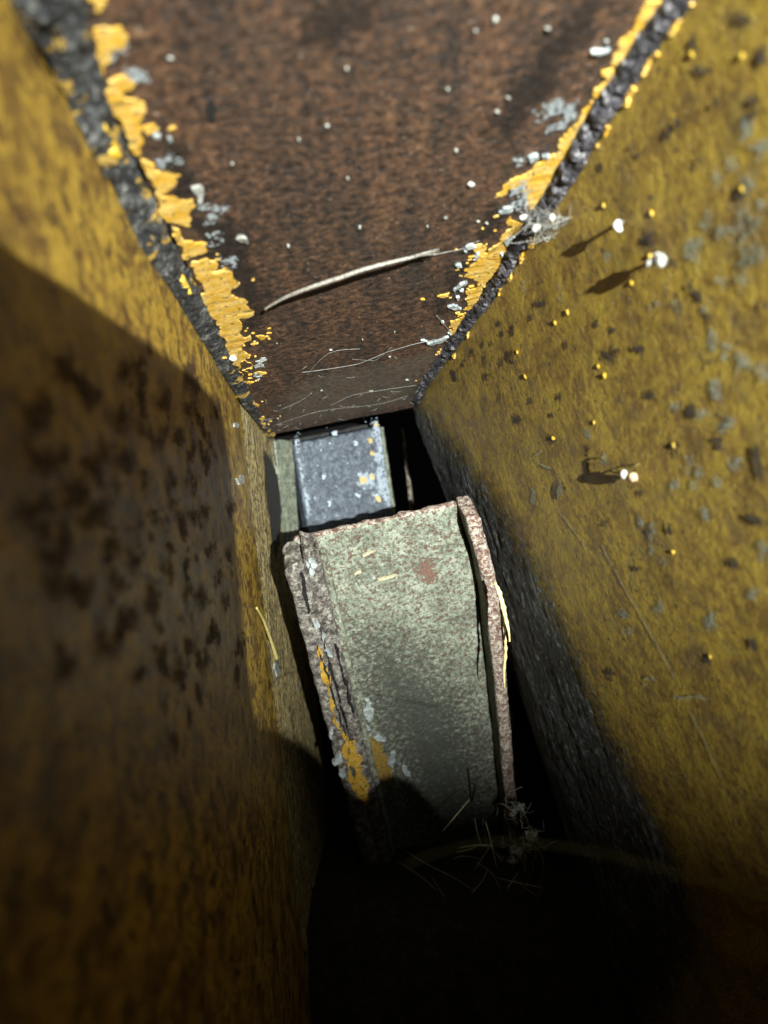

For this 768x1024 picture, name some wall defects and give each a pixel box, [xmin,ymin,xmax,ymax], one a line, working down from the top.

peeling [667,19,682,36]
peeling [89,0,272,384]
peeling [420,0,661,382]
corrosion [414,557,439,587]
peeling [313,620,370,807]
peeling [363,697,411,778]